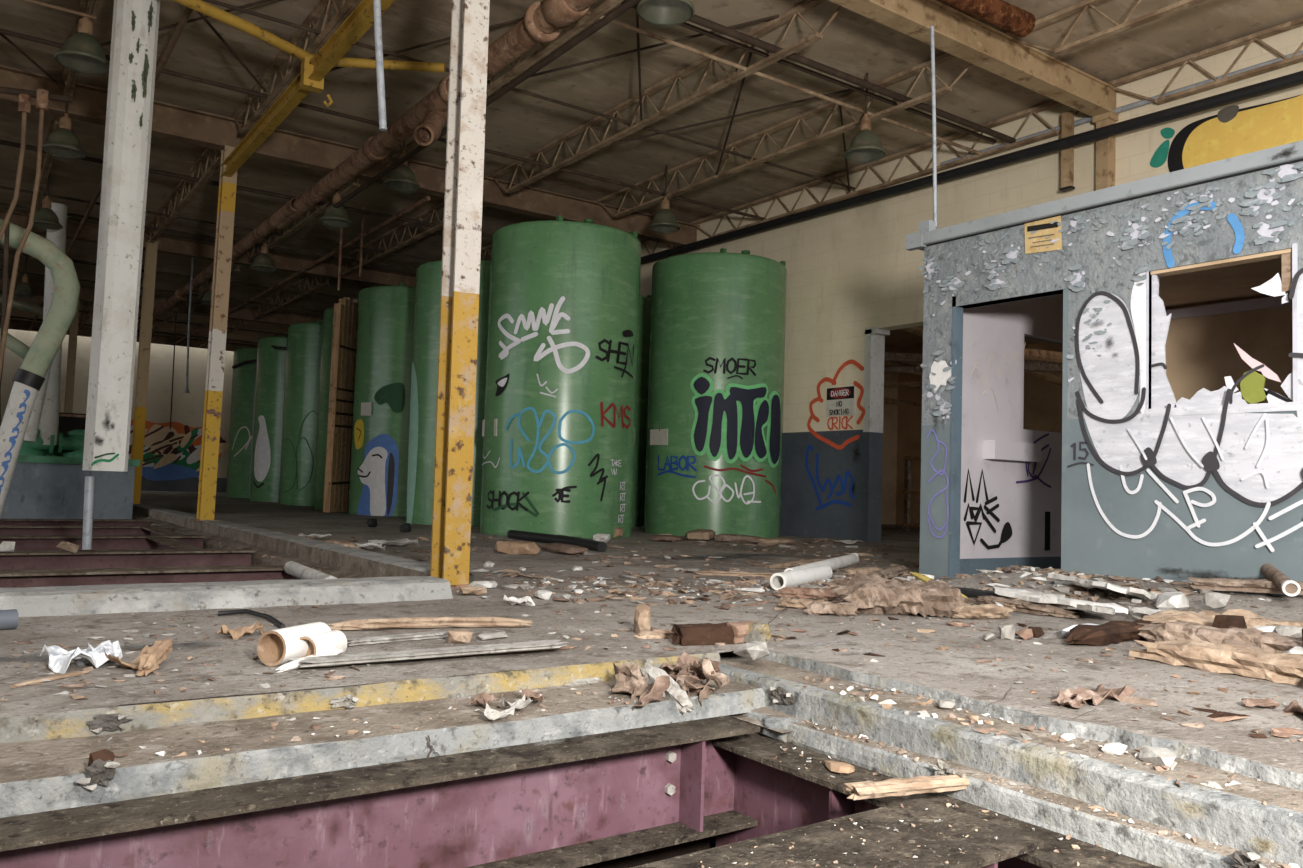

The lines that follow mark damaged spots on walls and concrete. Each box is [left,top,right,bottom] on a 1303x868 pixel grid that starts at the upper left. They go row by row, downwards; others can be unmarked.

peeling [919,163,1303,316]
peeling [1064,264,1112,393]